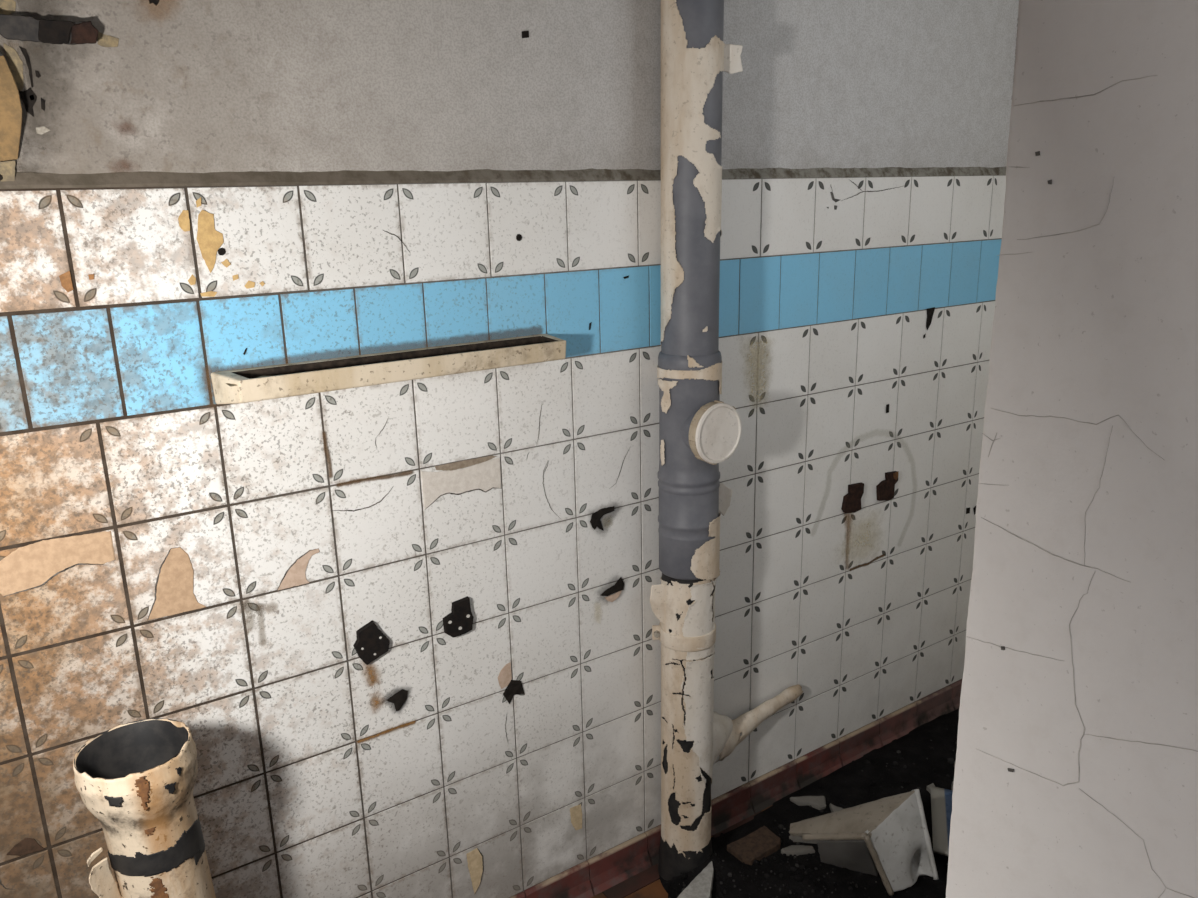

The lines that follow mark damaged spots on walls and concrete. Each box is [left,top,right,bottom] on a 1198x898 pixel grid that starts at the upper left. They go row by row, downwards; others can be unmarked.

flaking render [3,43,50,135]
crack [1014,75,1158,106]
spalling [178,197,265,289]
crack [1002,179,1114,255]
leakage [205,370,216,403]
spalling [421,456,502,510]
spalling [590,506,614,531]
spalling [0,531,115,597]
spalling [147,547,206,621]
spalling [277,548,320,591]
spalling [498,663,524,704]
crack [969,408,1198,898]